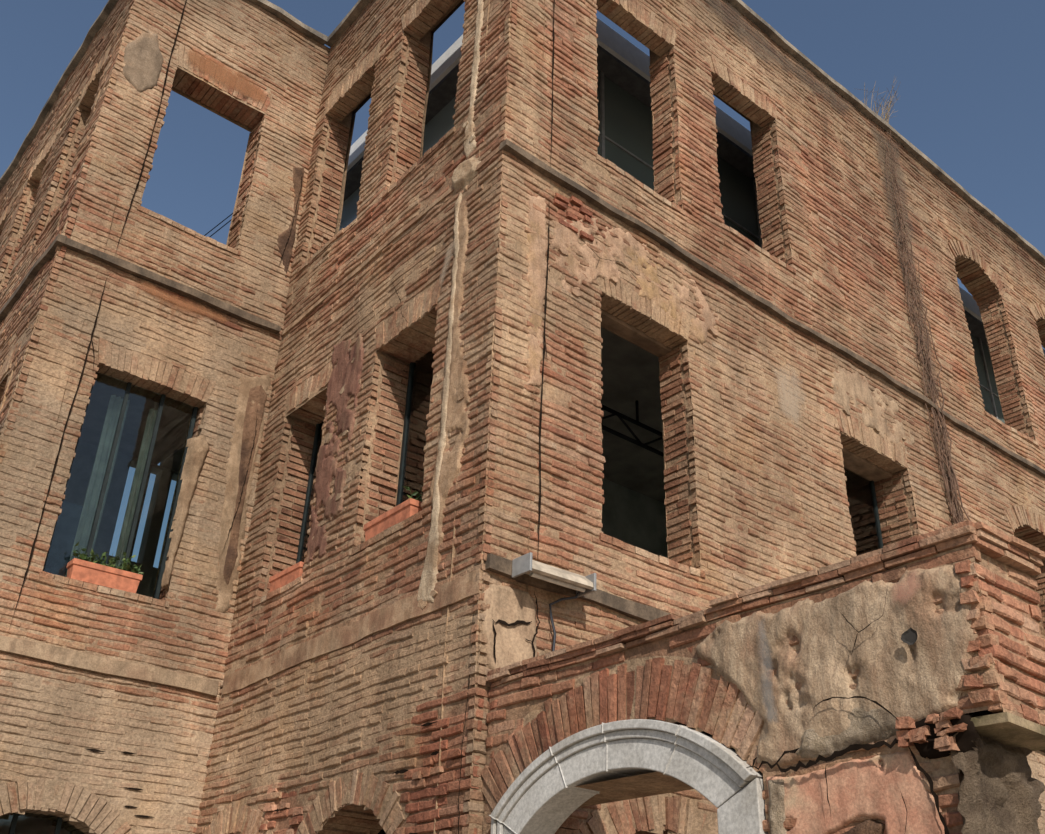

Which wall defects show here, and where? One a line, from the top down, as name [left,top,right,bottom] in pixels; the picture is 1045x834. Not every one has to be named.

crack [548,0,556,167]
spalling [553,193,594,242]
crack [9,0,187,629]
peeling [306,333,364,564]
crack [538,208,550,551]
crack [842,587,888,655]
spalling [394,749,466,796]
spalling [437,820,453,834]
crack [458,584,540,834]